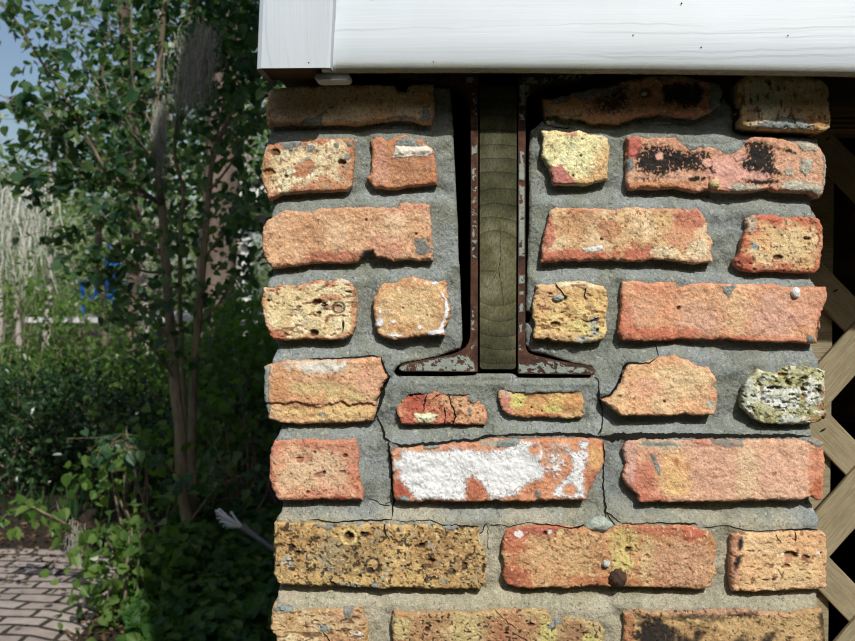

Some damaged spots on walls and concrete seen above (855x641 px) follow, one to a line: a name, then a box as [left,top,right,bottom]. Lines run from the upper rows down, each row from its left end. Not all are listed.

crack [311,344,818,549]